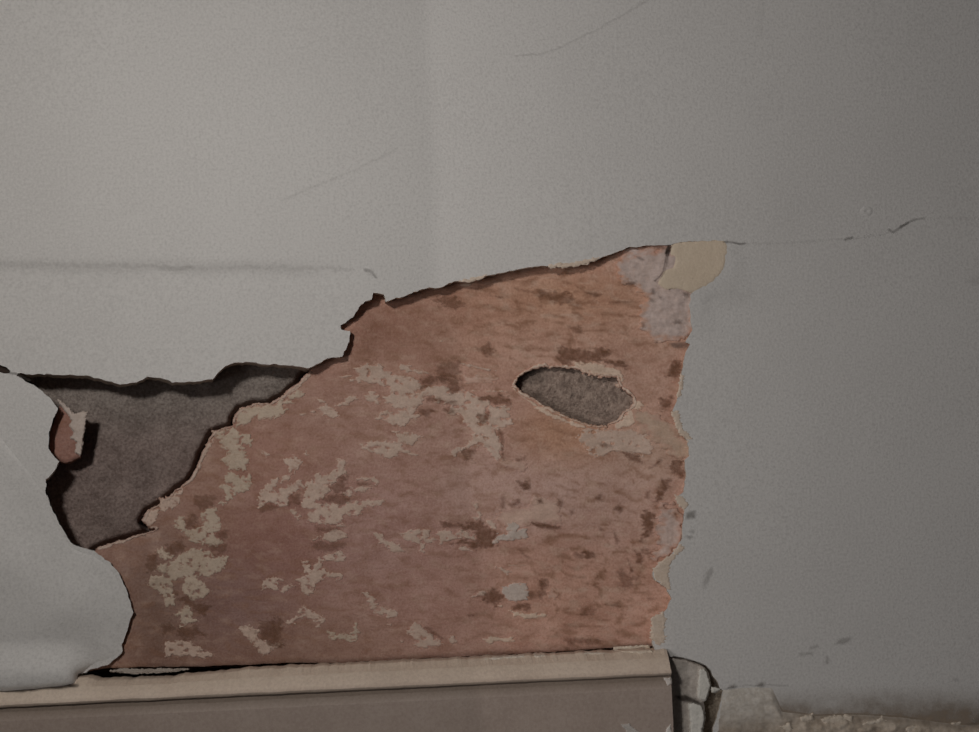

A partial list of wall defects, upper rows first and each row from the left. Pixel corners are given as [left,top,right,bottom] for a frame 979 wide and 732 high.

flaking render [17,241,696,675]
spalling [664,656,979,732]